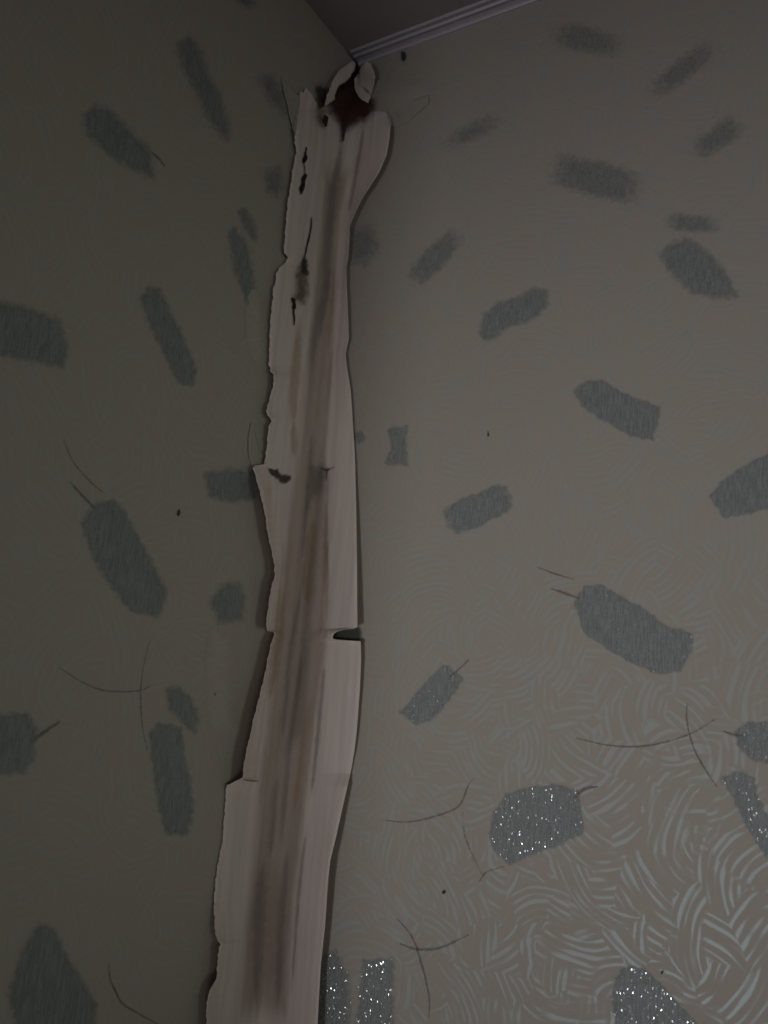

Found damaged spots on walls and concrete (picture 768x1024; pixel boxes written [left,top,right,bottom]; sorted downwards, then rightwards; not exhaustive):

peeling [298,61,379,116]